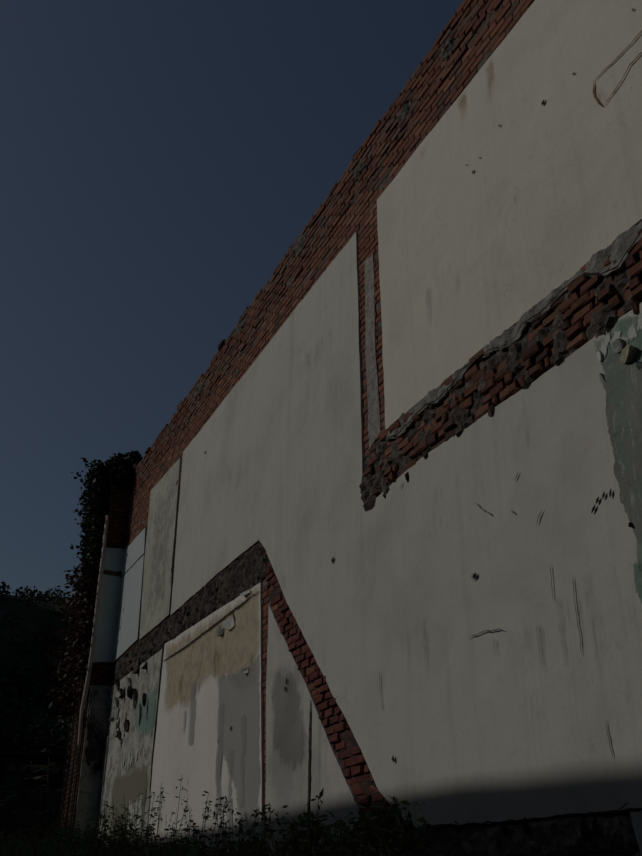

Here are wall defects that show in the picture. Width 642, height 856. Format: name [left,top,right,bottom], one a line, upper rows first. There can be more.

crack [593,30,642,107]
spalling [359,221,642,603]
leakage [166,591,259,836]
crack [407,802,642,829]